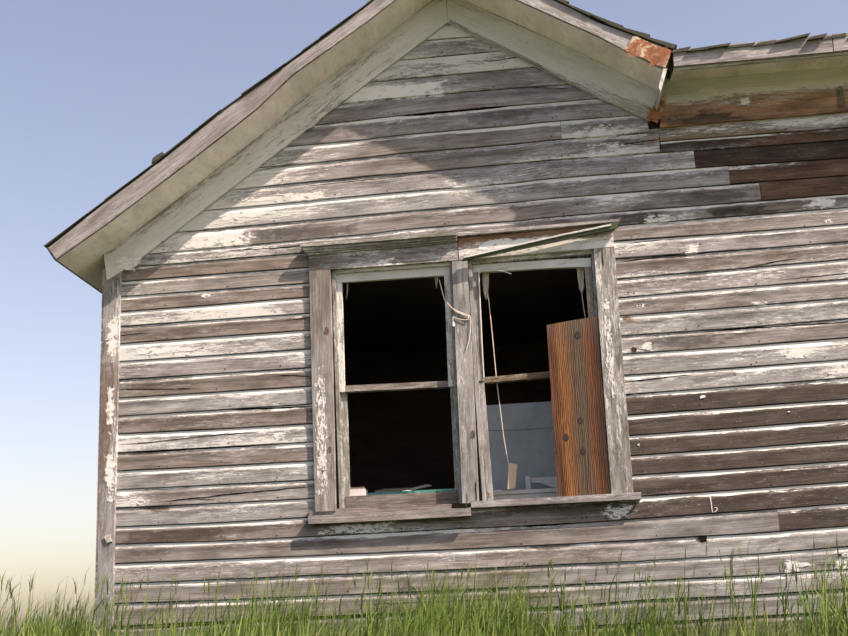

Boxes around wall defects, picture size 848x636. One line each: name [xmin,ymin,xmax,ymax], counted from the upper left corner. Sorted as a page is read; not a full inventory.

rust [628,42,668,67]
peeling [465,235,590,256]
peeling [113,253,142,272]
peeling [105,387,115,435]
peeling [314,368,328,495]
peeling [602,504,633,519]